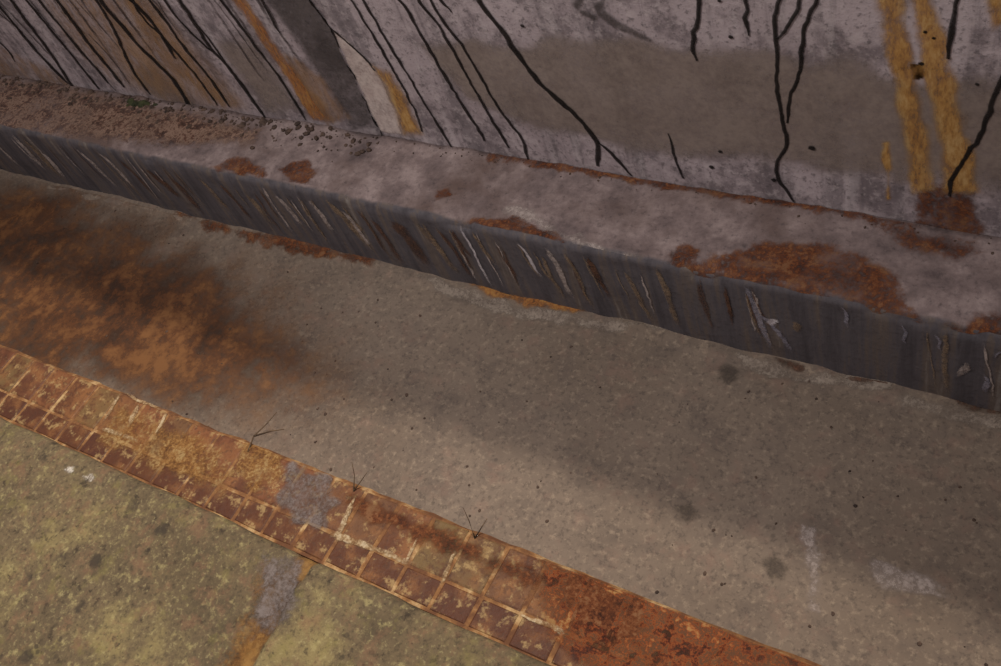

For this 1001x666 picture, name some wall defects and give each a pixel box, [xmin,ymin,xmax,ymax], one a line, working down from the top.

corrosion [215,157,266,177]
corrosion [234,0,334,120]
corrosion [280,160,315,183]
crack [309,0,382,135]
corrosion [377,70,419,133]
corrosion [487,0,983,256]
corrosion [0,189,298,403]
corrosion [201,220,372,264]
corrosion [475,284,580,312]
corrosion [673,242,919,323]
corrosion [100,410,227,481]
corrosion [347,494,807,666]